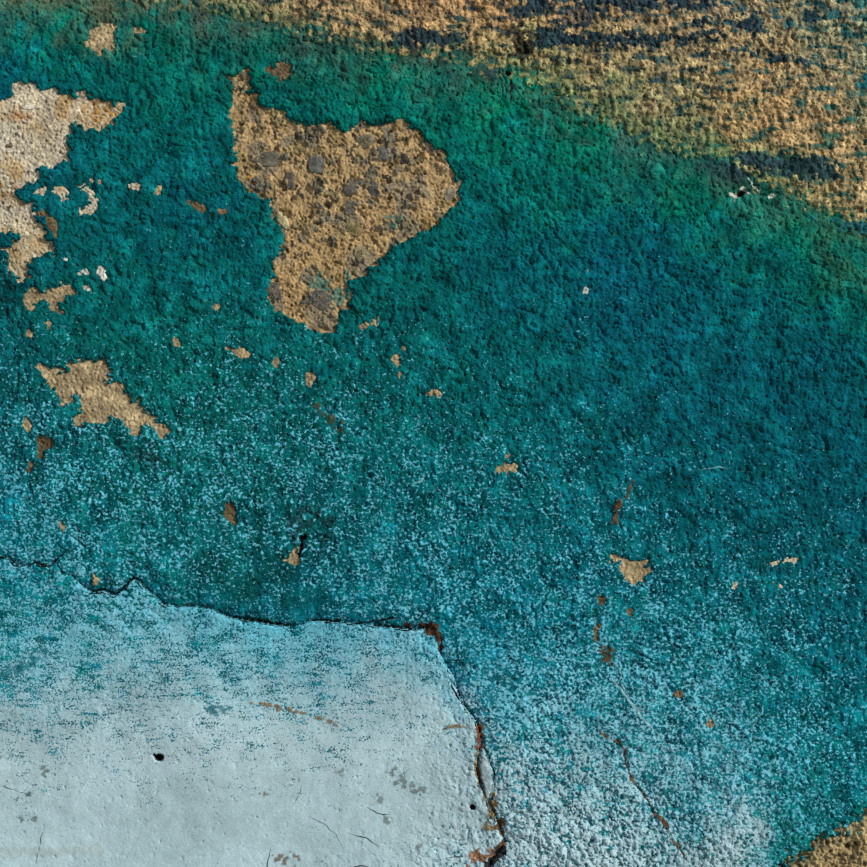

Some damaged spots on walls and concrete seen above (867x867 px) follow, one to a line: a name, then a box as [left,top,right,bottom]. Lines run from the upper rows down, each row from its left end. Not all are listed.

peeling [83,22,117,56]
peeling [125,0,867,222]
spalling [0,80,126,330]
spalling [226,68,463,333]
spalling [35,358,171,439]
peeling [391,345,406,379]
crack [0,550,505,867]
spalling [483,845,507,867]
spalling [772,806,867,867]